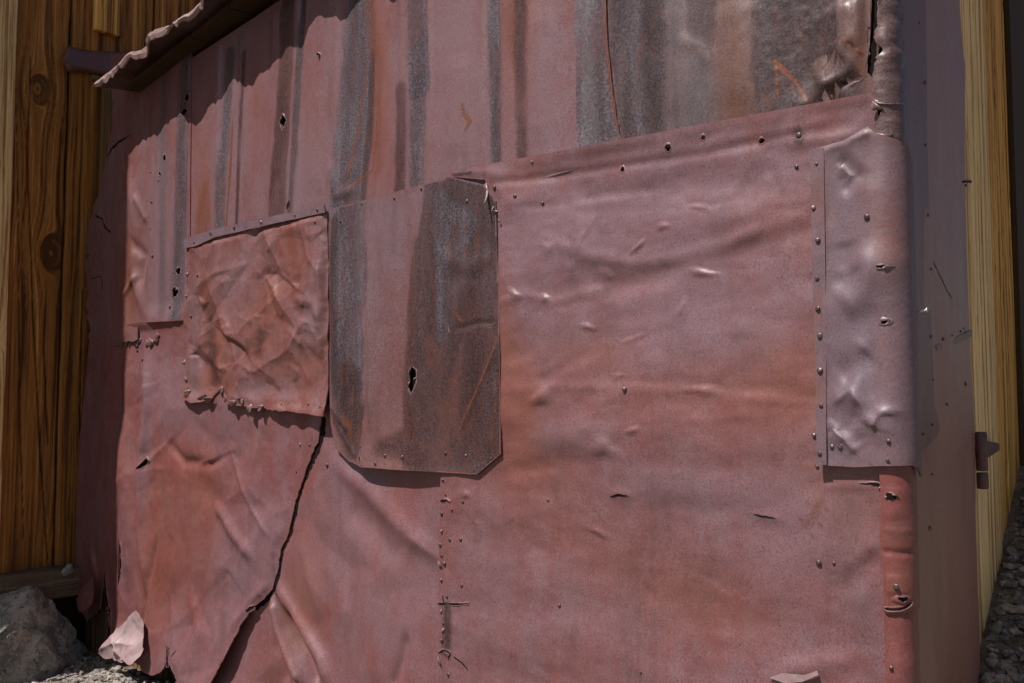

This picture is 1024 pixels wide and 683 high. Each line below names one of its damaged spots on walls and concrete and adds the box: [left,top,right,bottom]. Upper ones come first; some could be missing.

rust [269,0,295,215]
rust [403,239,420,469]
crack [255,416,326,610]